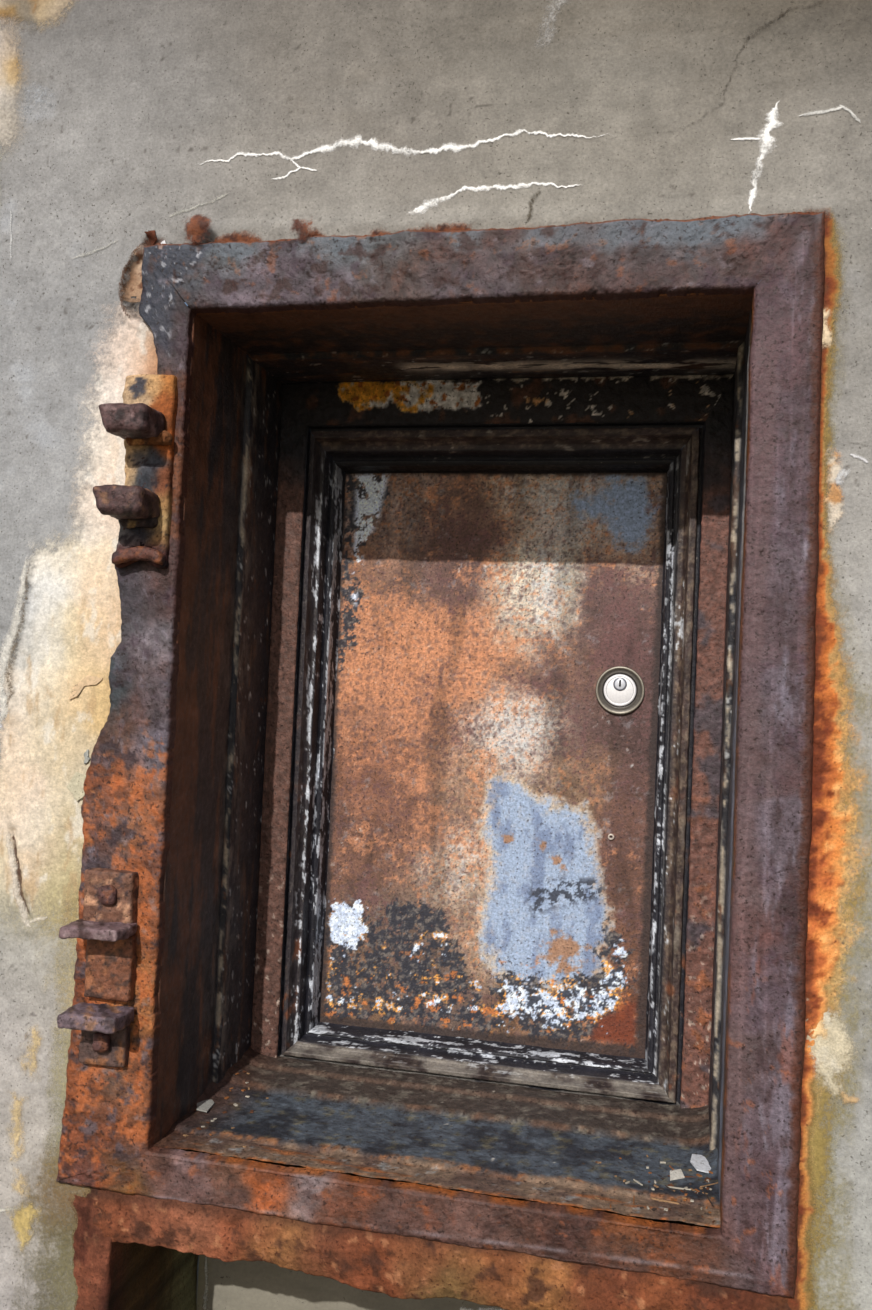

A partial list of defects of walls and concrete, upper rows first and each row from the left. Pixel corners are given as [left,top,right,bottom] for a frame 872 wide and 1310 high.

corrosion [184,214,261,244]
corrosion [291,219,324,241]
corrosion [408,223,471,231]
crack [6,833,47,927]